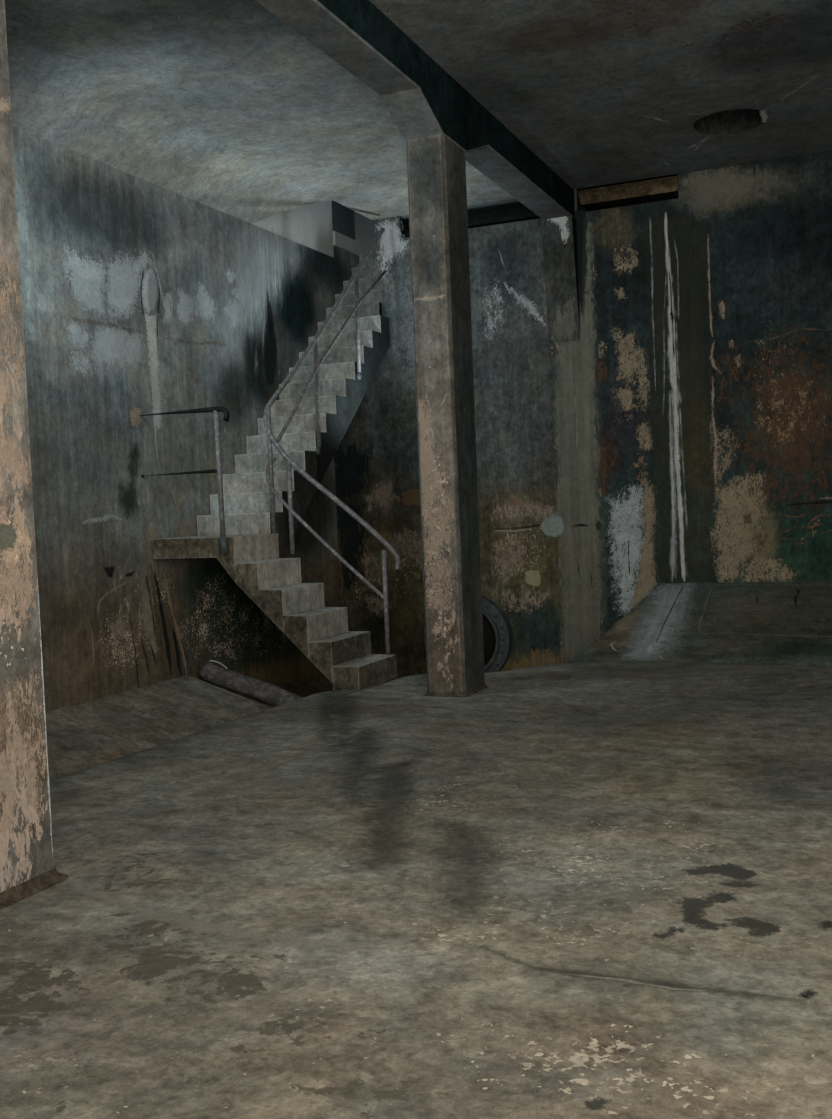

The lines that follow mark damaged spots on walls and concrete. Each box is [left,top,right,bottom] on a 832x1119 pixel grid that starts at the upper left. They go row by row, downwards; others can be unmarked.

peeling [60,239,154,380]
water stain [227,230,300,387]
peeling [612,244,639,274]
peeling [0,231,38,630]
peeling [598,326,655,451]
peeling [707,235,799,583]
peeling [91,566,159,667]
peeling [0,664,48,841]
water stain [654,864,781,938]